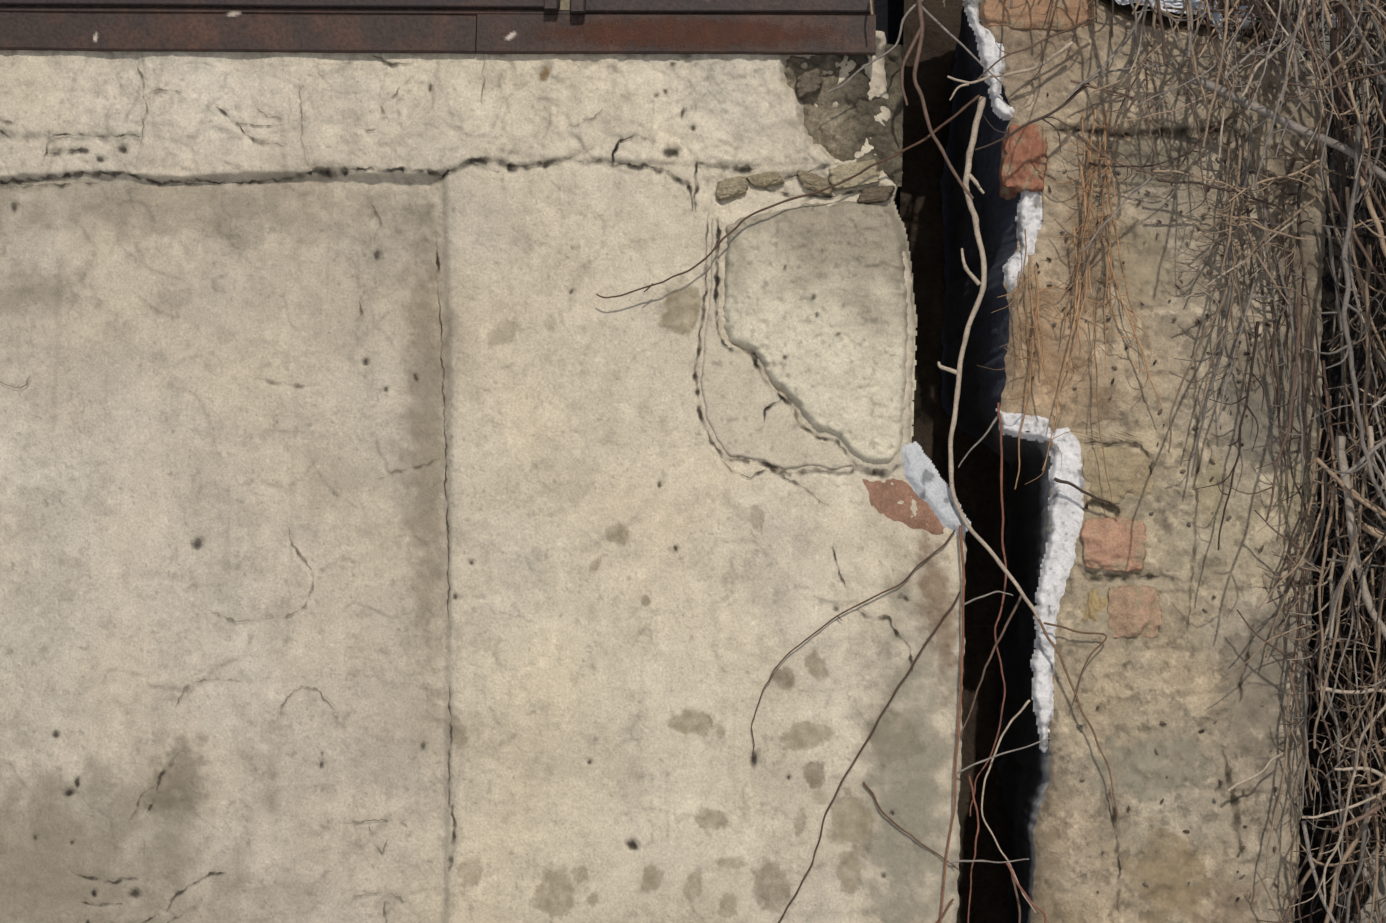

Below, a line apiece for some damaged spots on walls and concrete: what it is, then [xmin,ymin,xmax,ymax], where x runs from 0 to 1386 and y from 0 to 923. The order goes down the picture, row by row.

crack [366,56,404,131]
spalling [715,44,904,204]
peeling [963,0,1015,120]
crack [0,68,898,501]
peeling [1003,190,1043,293]
crack [392,302,450,609]
spalling [862,478,945,535]
peeling [996,408,1085,752]
crack [448,696,456,861]